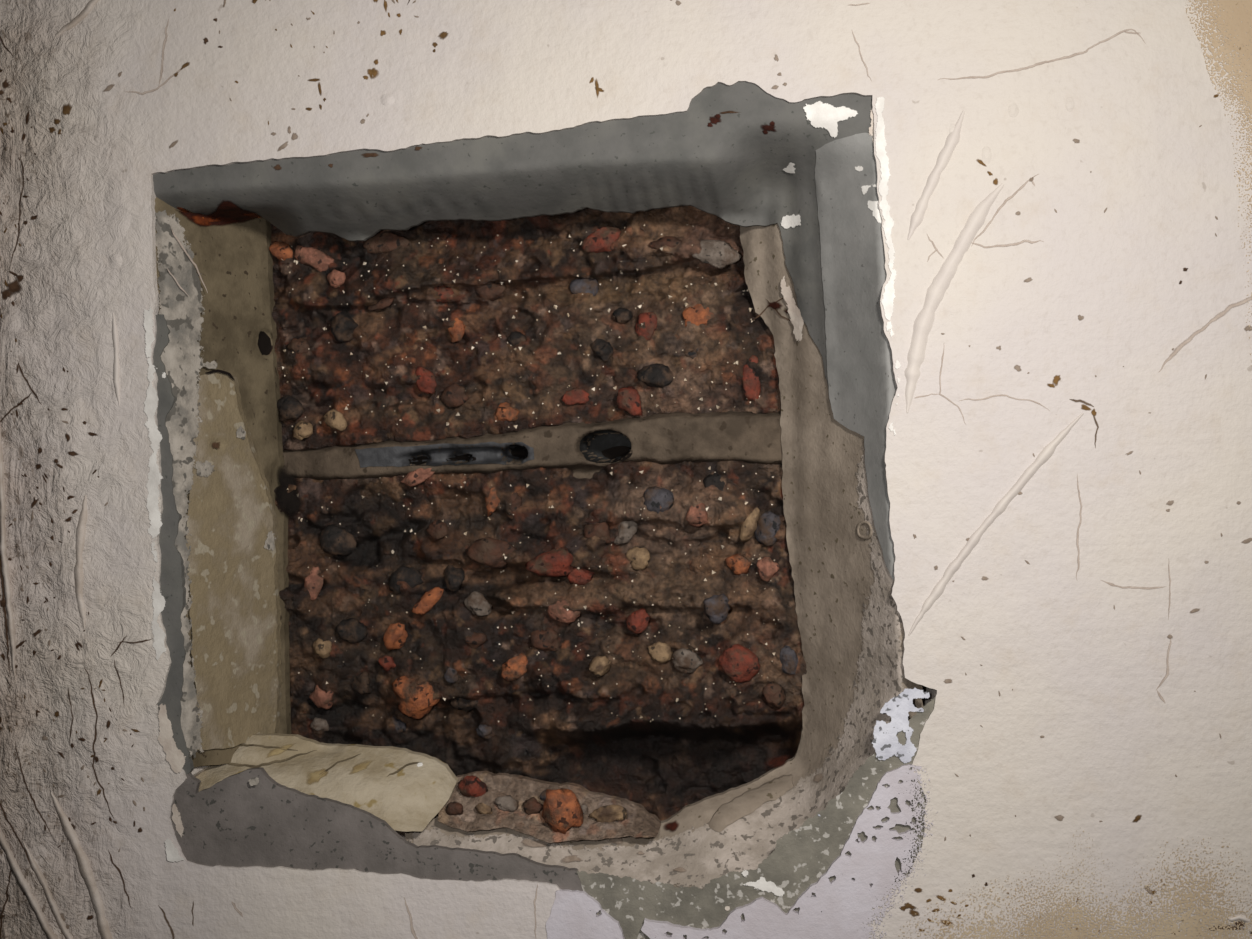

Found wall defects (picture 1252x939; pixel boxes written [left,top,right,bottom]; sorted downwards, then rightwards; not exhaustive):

crack [938,29,1146,80]
crack [10,157,24,265]
crack [1159,297,1252,372]
crack [0,363,42,422]
crack [915,350,1099,448]
spalling [144,55,935,939]
crack [0,555,12,680]
crack [1076,475,1171,703]
crack [68,637,153,818]
crack [0,742,51,939]
crack [108,850,194,939]
peeling [900,888,968,931]